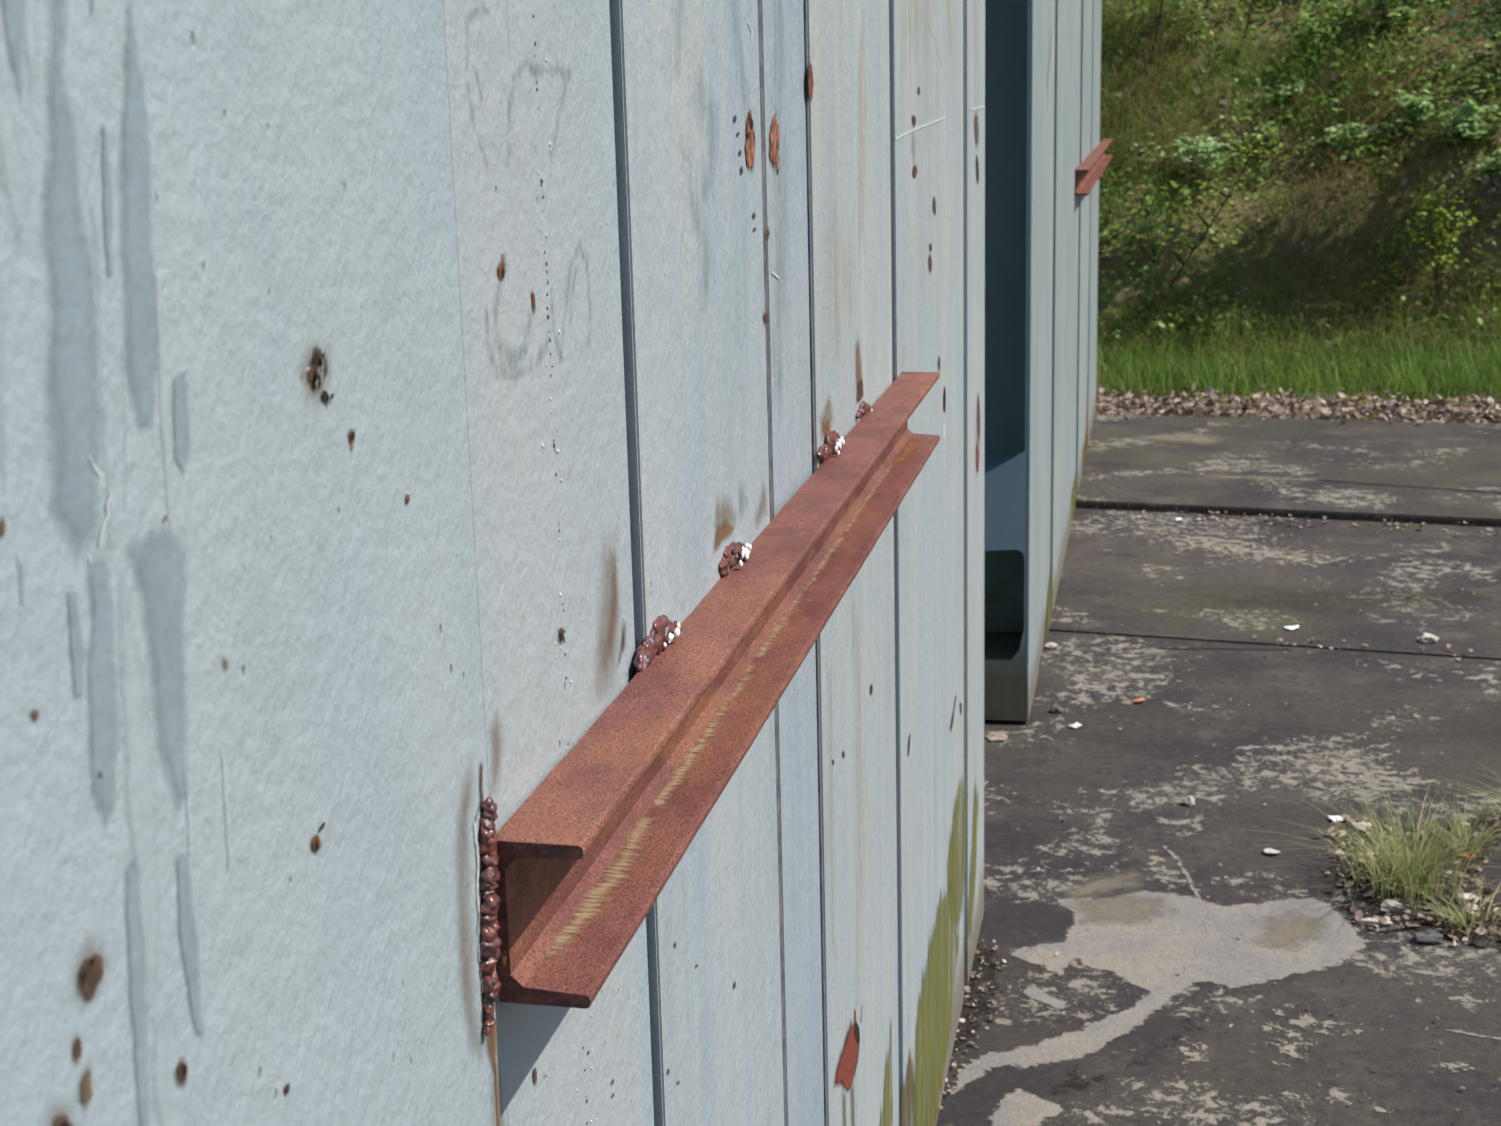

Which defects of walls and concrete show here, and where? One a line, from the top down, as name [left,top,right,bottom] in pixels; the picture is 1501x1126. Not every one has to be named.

corrosion [745,109,782,173]
corrosion [304,347,334,404]
corrosion [822,404,831,436]
corrosion [715,507,733,549]
leakage [0,0,203,1126]
corrosion [461,765,483,992]
corrosion [79,954,103,999]
leakage [880,778,977,1126]
corrosion [75,1038,92,1102]
corrosion [836,1026,858,1091]
corrosion [54,1114,73,1126]
leakage [844,1090,855,1126]